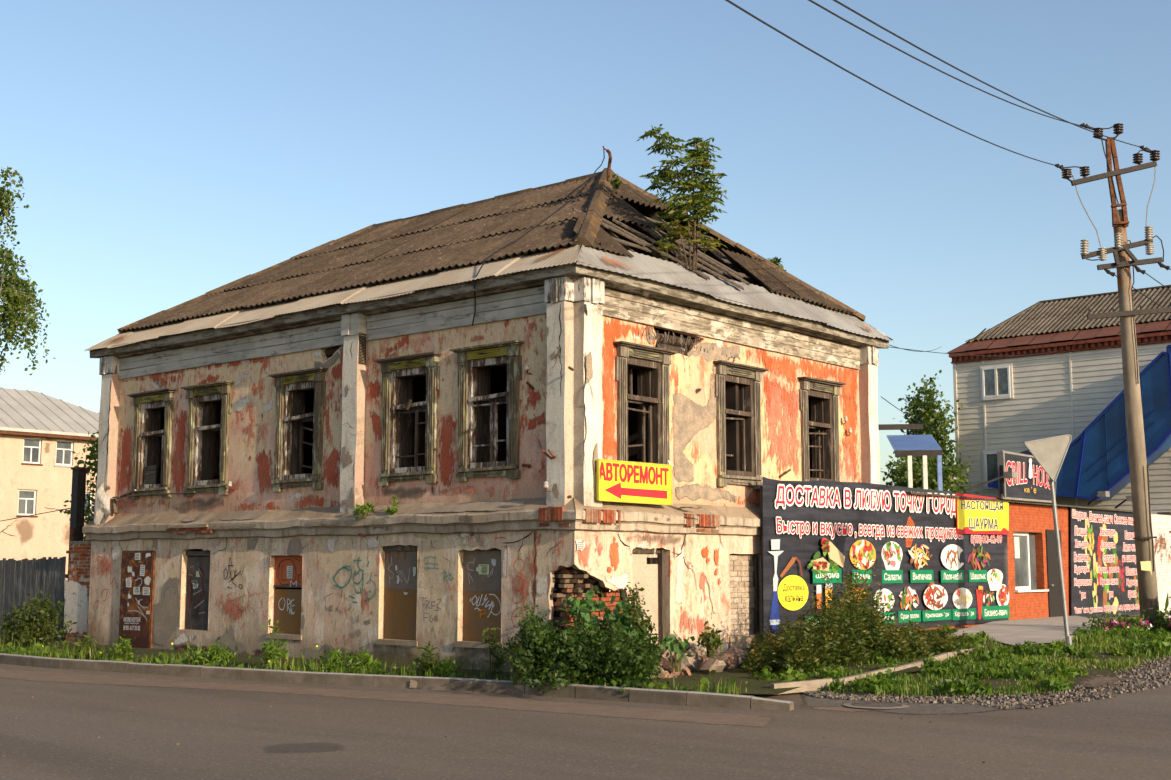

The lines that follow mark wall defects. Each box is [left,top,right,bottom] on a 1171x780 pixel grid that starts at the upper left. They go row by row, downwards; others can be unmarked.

peeling [104,357,265,521]
peeling [294,345,363,525]
peeling [370,380,382,441]
peeling [519,385,546,434]
flaking render [671,338,859,533]
peeling [228,449,280,511]
flaking render [66,547,113,585]
spalling [147,527,215,550]
peeling [329,588,372,637]
spalling [513,484,628,640]
peeling [679,546,721,641]